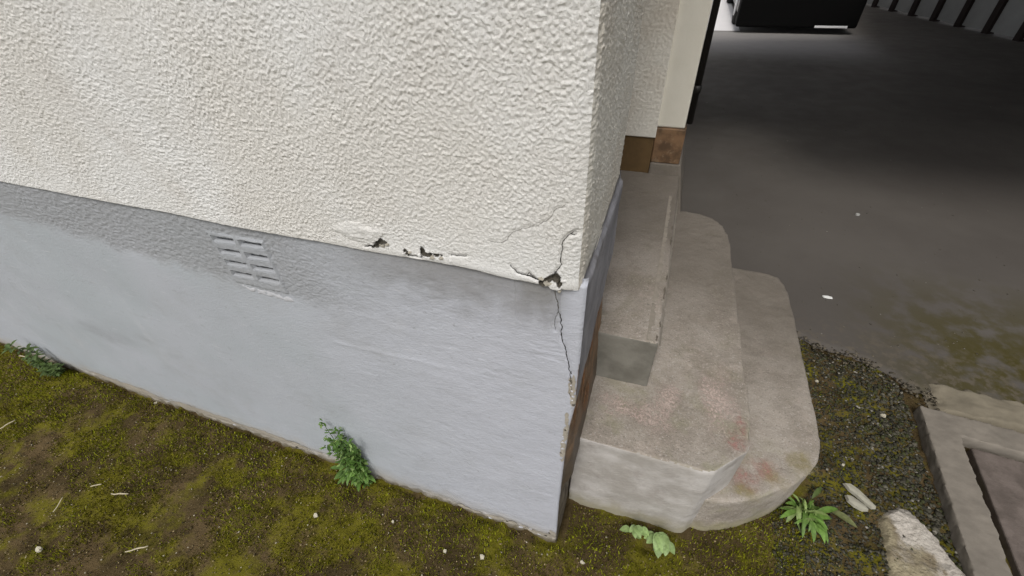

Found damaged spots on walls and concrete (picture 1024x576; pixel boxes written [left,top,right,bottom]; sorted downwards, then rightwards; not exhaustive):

spalling [365,238,389,248]
spalling [402,248,462,260]
spalling [538,273,566,293]
crack [489,205,575,397]